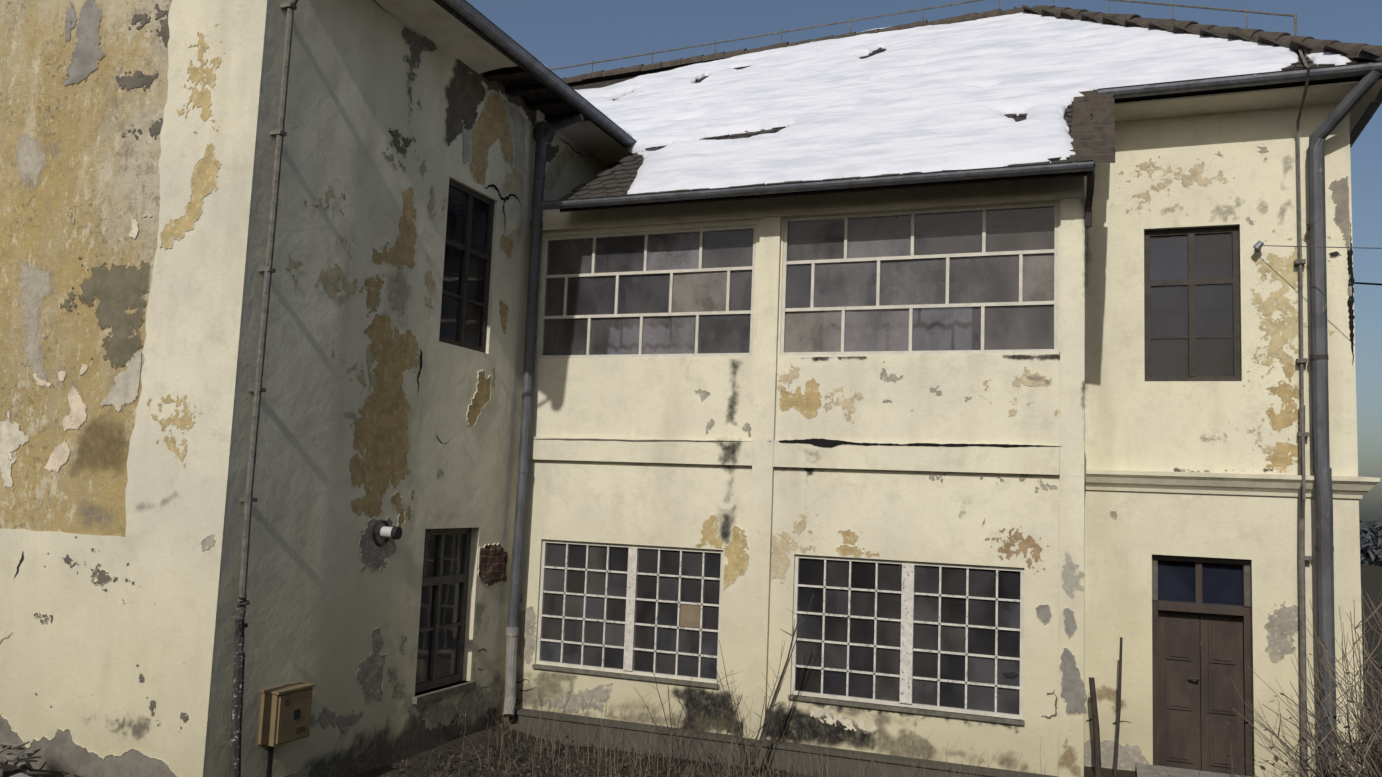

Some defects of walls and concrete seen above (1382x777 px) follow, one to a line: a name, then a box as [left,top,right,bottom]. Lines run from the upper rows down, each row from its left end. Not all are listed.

flaking render [444,58,560,186]
crack [484,184,522,229]
peeling [285,113,447,533]
peeling [1226,229,1310,473]
peeling [777,364,864,424]
crack [540,436,735,444]
damp [720,442,739,470]
crack [769,438,1058,448]
damp [721,515,732,540]
flaking render [477,543,508,587]
flaking render [1035,556,1088,716]
flaking render [0,711,181,777]